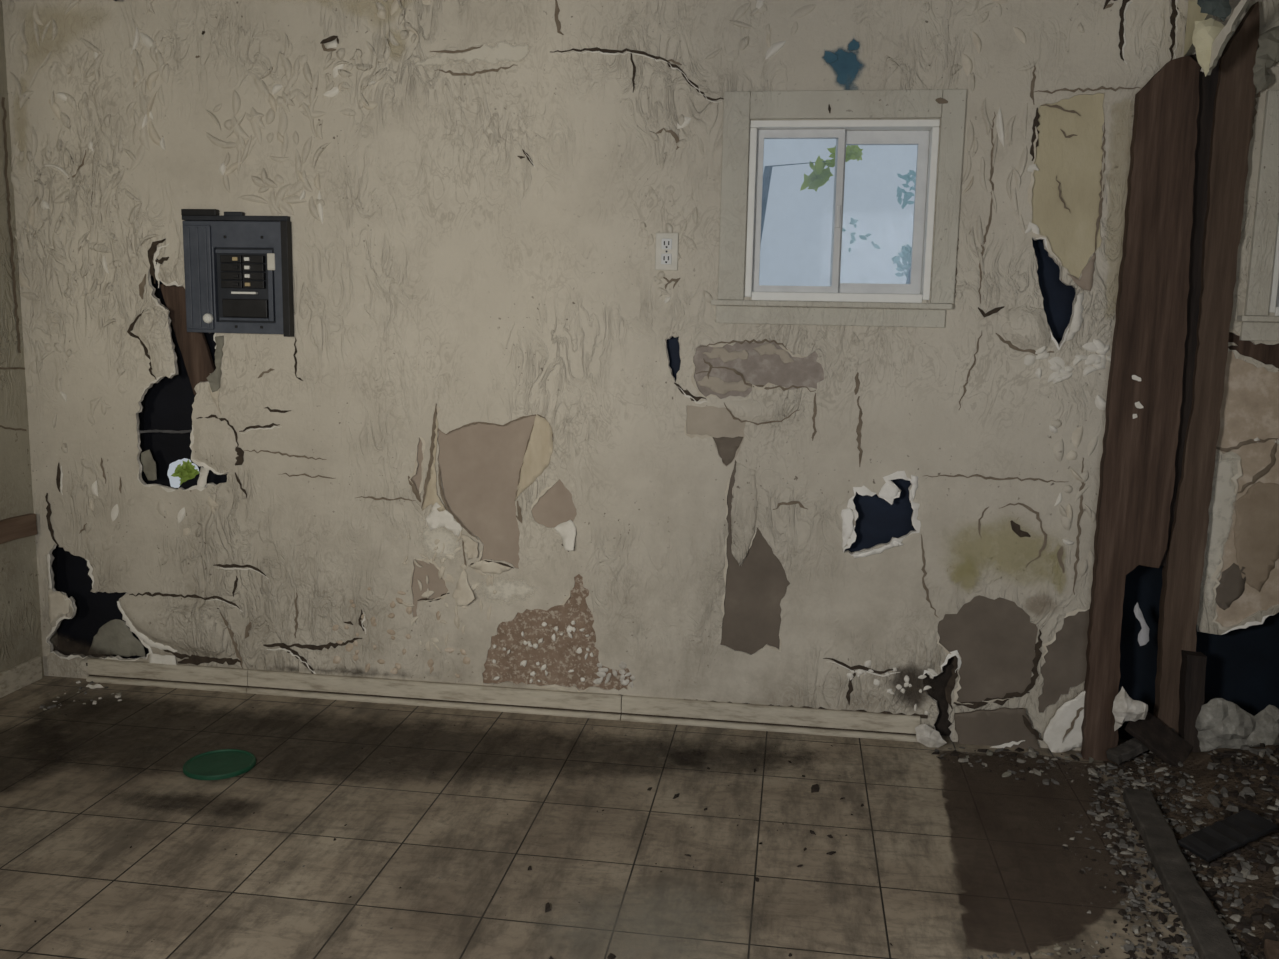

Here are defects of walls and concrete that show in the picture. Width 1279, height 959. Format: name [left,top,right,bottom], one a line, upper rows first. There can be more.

crack [550,0,724,103]
crack [1030,0,1140,104]
crack [1169,0,1180,60]
hole [136,258,228,492]
hole [45,493,153,661]
crack [205,564,366,674]
peeling [408,403,632,692]
peeling [666,335,824,655]
hole [841,471,921,559]
peeling [923,595,1090,741]
hole [1118,565,1163,714]
peeling [1196,351,1279,716]